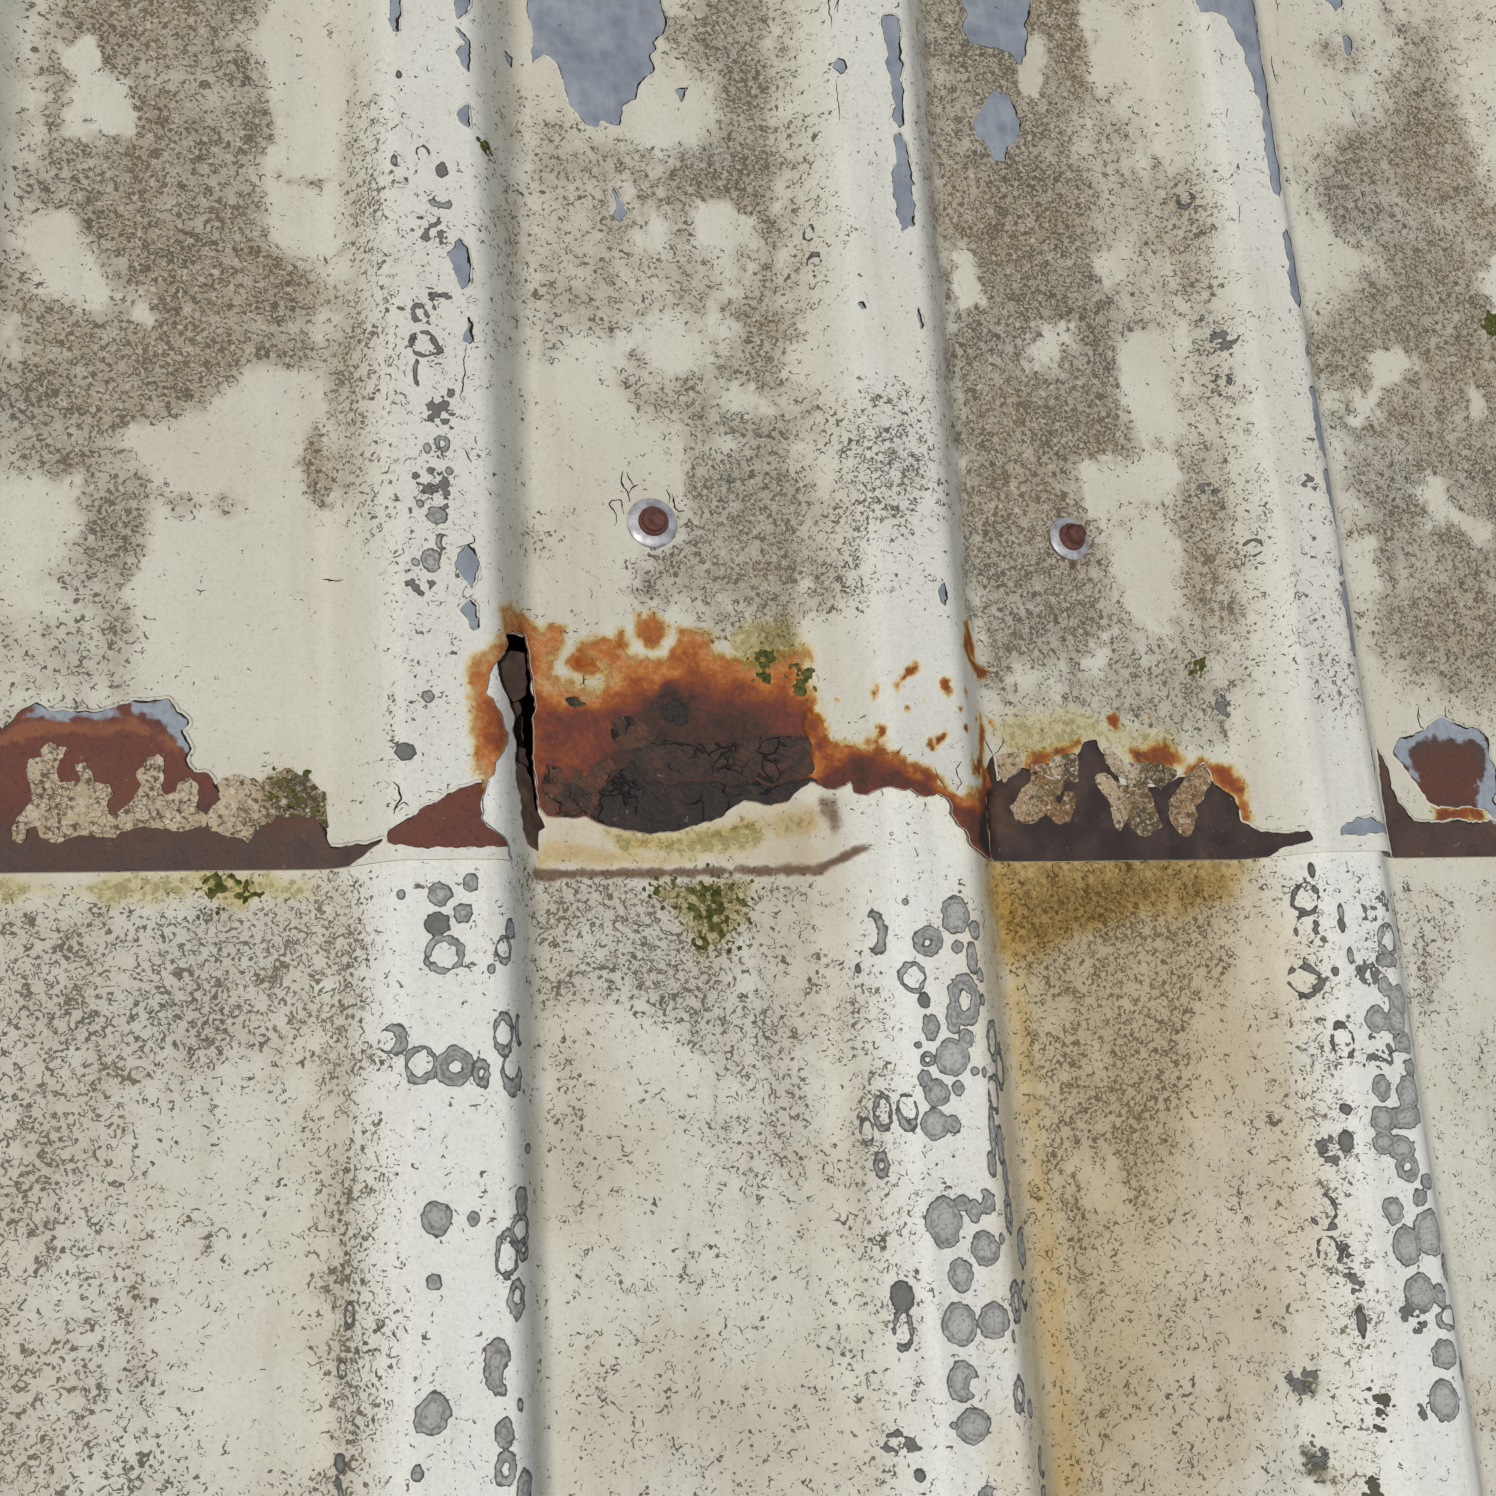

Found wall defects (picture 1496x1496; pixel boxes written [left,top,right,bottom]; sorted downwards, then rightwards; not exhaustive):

peeling [504,0,669,130]
peeling [675,87,688,102]
peeling [832,58,847,74]
peeling [879,13,916,232]
peeling [959,0,1033,65]
peeling [971,88,1023,163]
peeling [1192,0,1281,198]
peeling [1283,229,1302,310]
peeling [1307,385,1337,532]
peeling [1339,560,1356,657]
rust [0,608,1313,873]
rust [1375,715,1496,858]